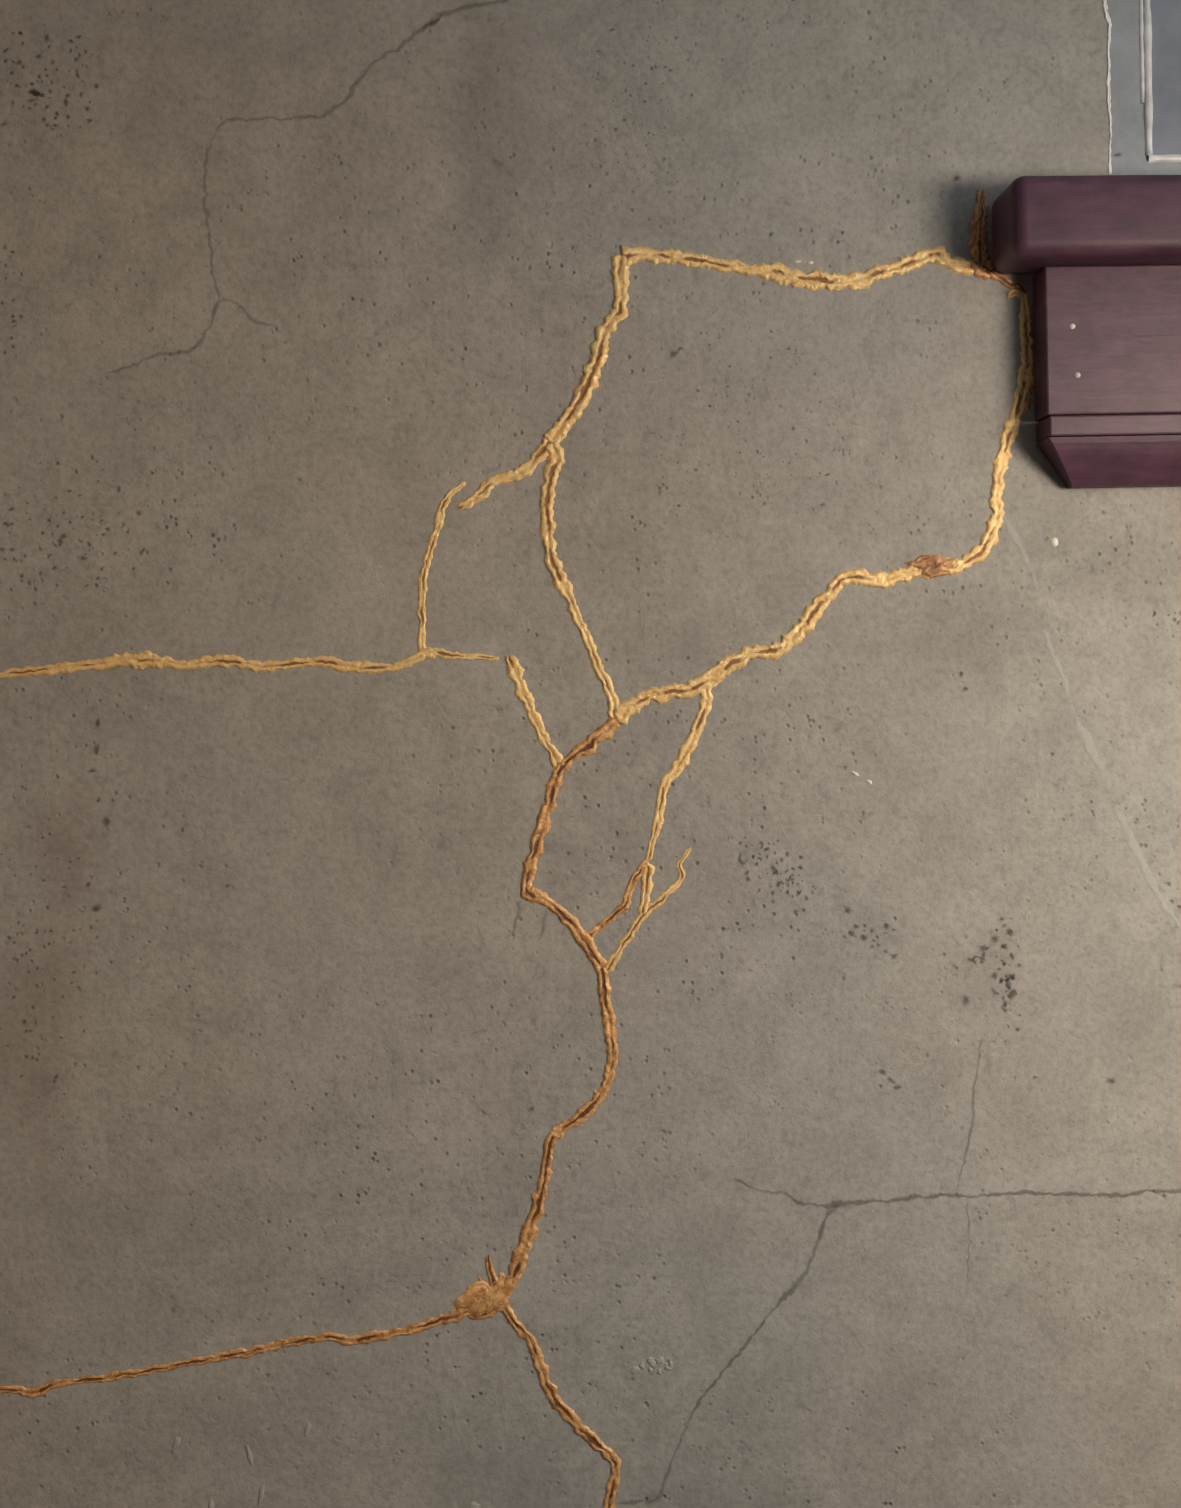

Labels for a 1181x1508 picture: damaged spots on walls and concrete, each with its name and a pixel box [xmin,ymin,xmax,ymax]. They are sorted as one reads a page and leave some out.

crack [0,189,1034,1508]